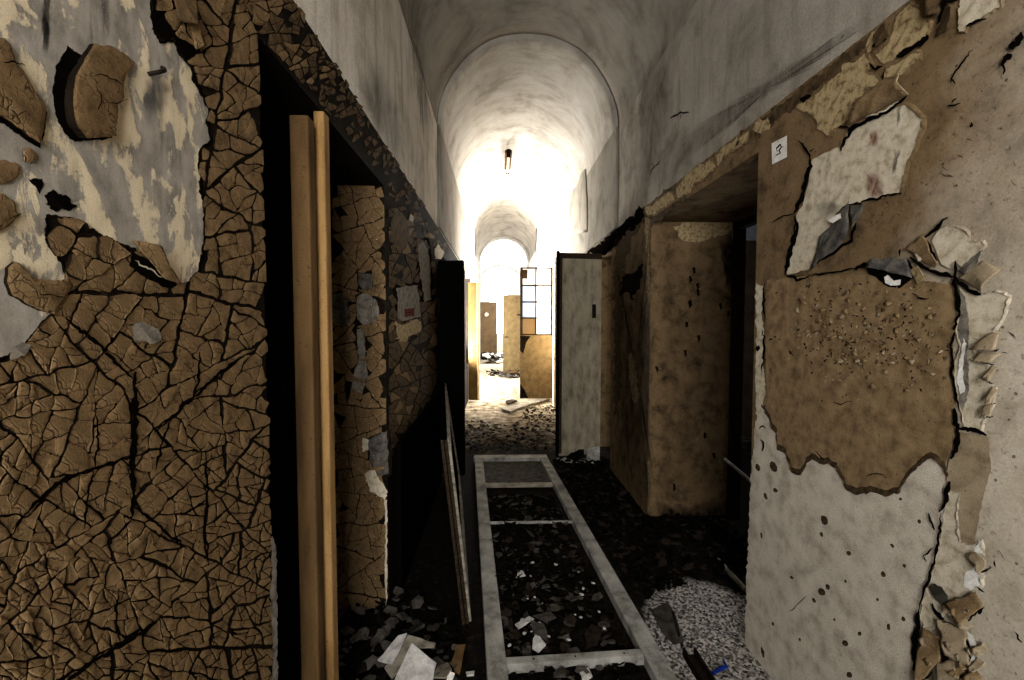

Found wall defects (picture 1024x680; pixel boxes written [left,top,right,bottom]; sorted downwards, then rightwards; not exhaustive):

crack [68,589,155,680]
crack [12,318,242,566]
peeling [0,0,447,680]
flaking render [587,0,1012,680]